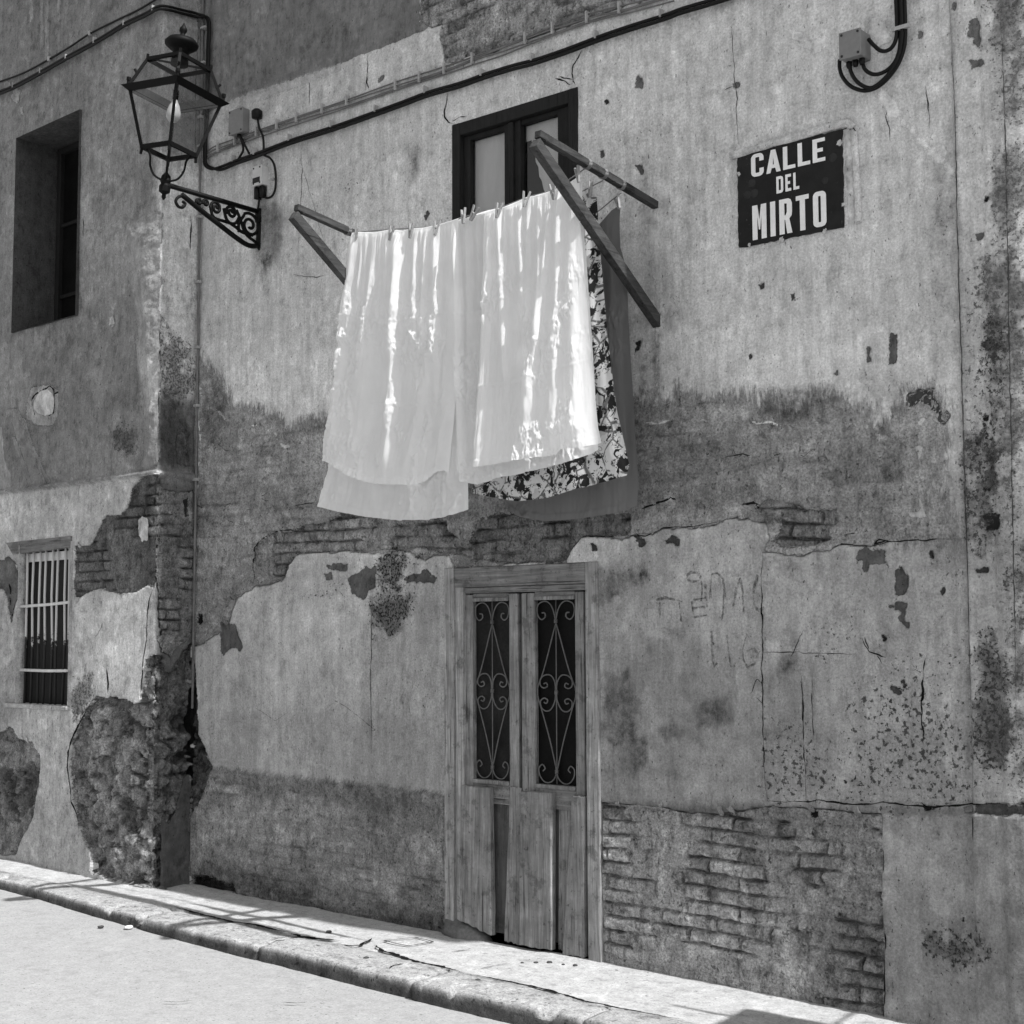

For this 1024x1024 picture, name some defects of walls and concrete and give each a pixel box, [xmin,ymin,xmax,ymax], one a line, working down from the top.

spalling [420,0,641,63]
crack [925,68,965,475]
spalling [25,385,59,426]
peeling [70,138,1024,1017]
crack [578,493,723,542]
crack [840,531,936,547]
crack [962,505,970,578]
crack [751,552,1013,840]
peeling [0,727,40,855]